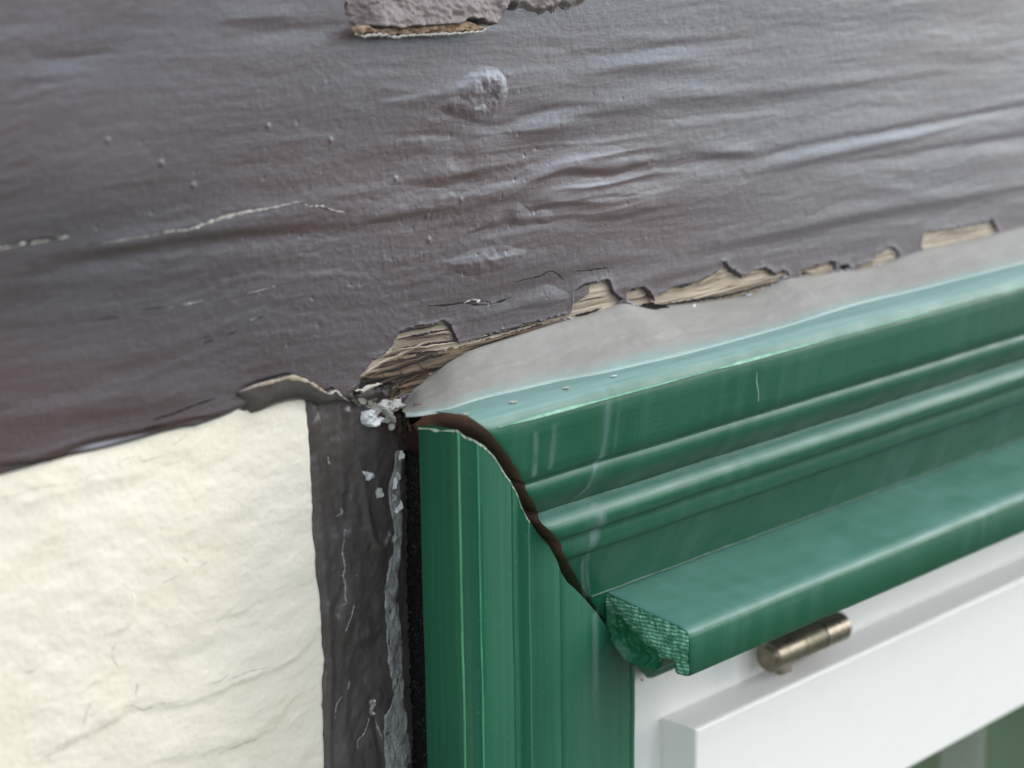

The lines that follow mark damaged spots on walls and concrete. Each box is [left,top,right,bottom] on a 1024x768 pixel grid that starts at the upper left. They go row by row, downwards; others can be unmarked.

peeling [346,0,586,39]
crack [0,201,349,249]
peeling [922,219,997,249]
peeling [238,248,897,437]